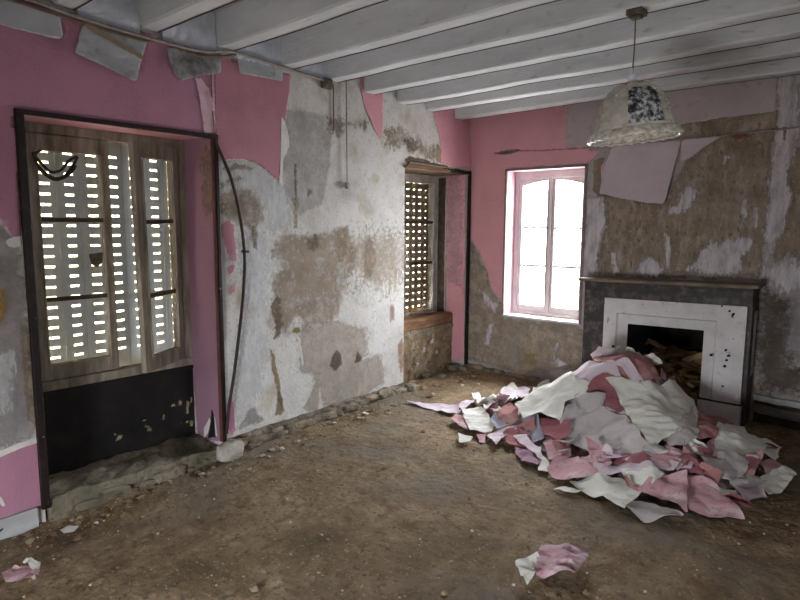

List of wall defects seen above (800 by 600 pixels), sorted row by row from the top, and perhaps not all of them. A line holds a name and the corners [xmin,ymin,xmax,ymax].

flaking render [220,164,260,249]
flaking render [405,156,464,171]
flaking render [593,111,777,280]
flaking render [773,149,800,260]
damp [338,229,407,294]
flaking render [0,228,35,447]
flaking render [271,226,384,411]
flaking render [403,323,453,384]
flaking render [228,401,263,436]